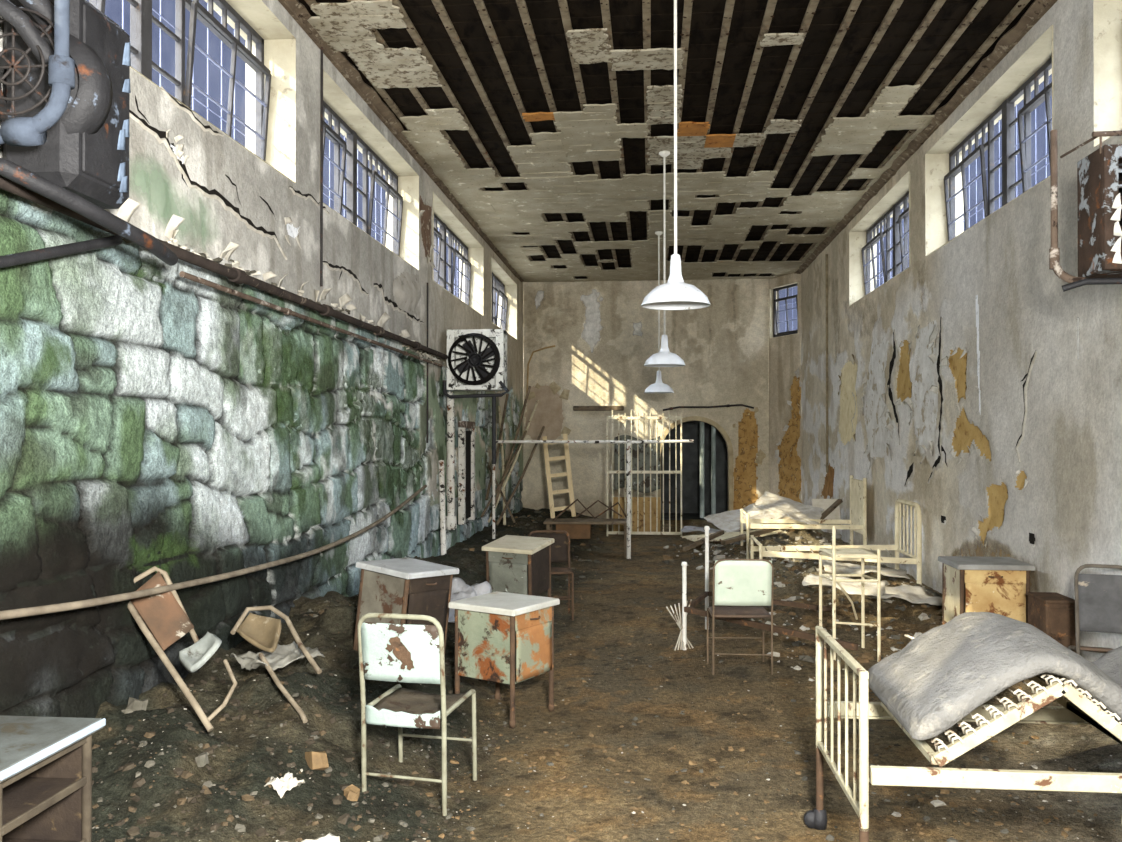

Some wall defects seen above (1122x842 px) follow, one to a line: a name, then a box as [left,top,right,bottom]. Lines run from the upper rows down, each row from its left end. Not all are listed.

crack [129,86,330,260]
crack [323,261,424,324]
flaking render [732,368,802,510]
flaking render [821,459,835,499]
peeling [838,320,991,475]
flaking render [971,470,1028,547]